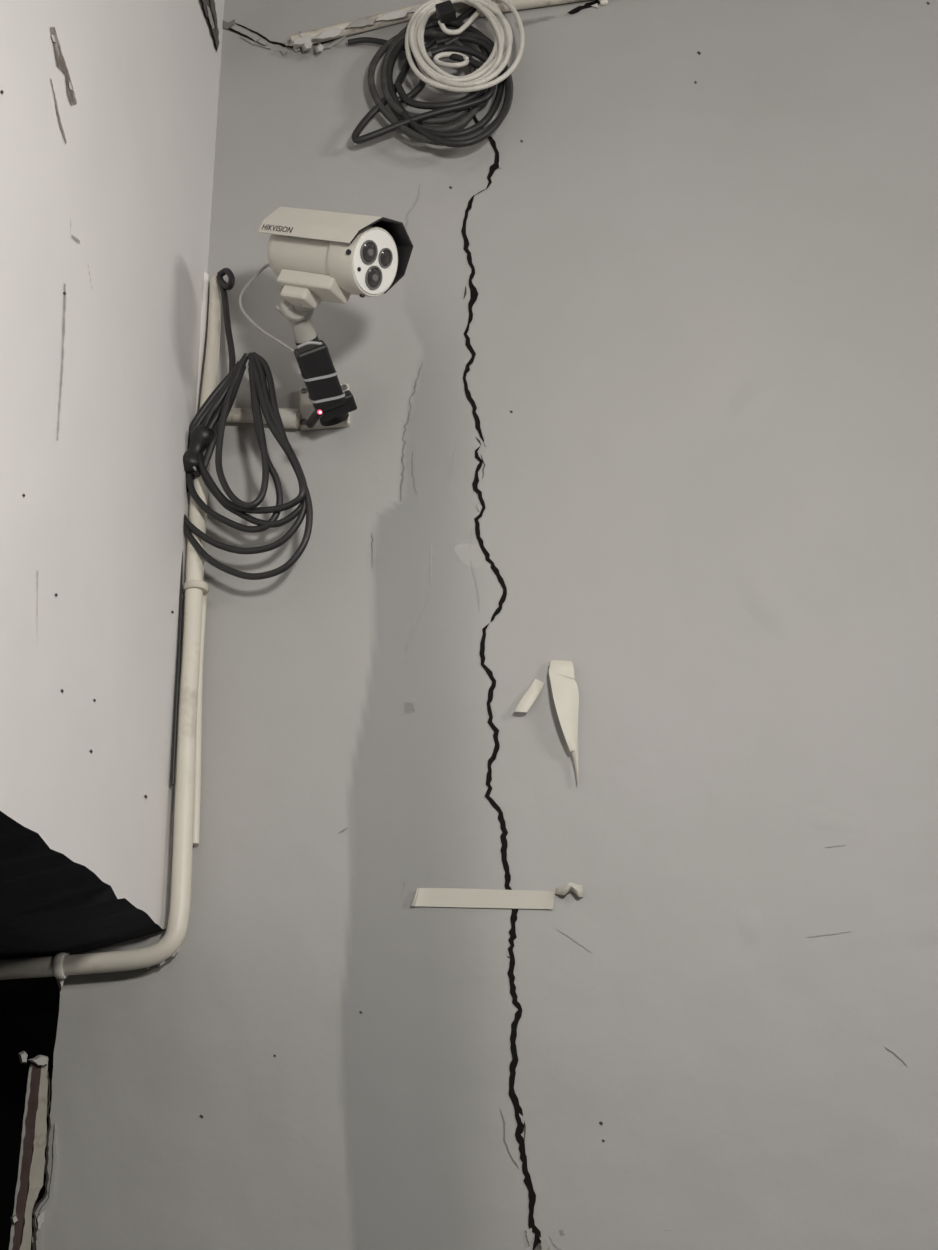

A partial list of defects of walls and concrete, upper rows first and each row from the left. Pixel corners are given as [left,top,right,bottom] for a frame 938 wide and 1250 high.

crack [400,362,423,501]
crack [461,109,563,1250]
spalling [525,1228,550,1250]